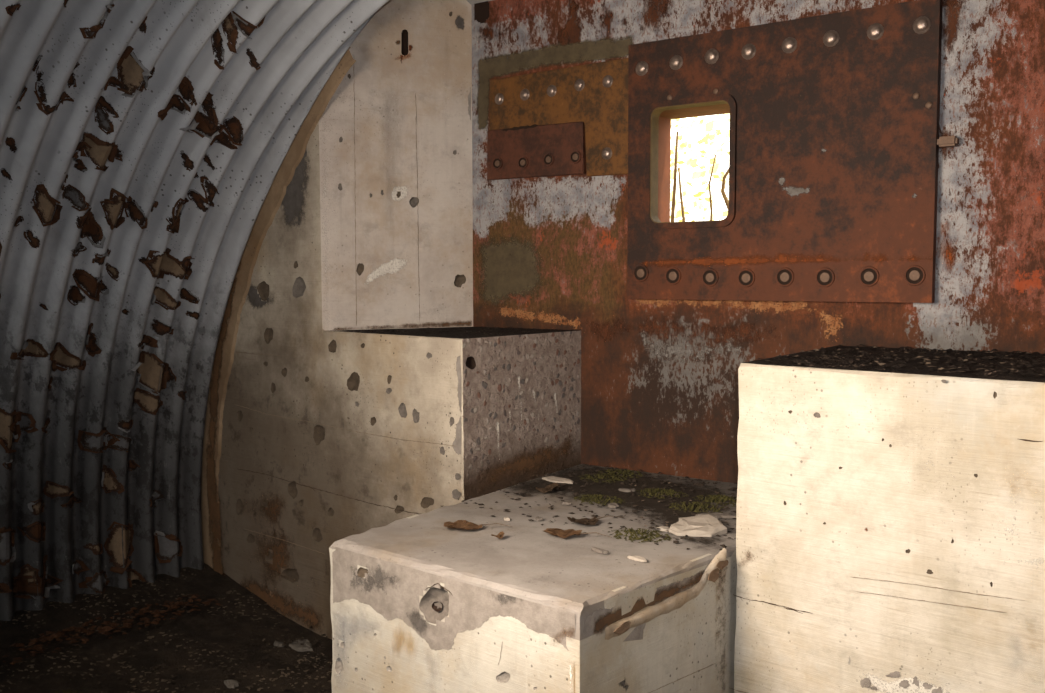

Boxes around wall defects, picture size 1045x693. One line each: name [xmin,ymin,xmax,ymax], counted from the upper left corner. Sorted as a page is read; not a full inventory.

corrosion [476,25,502,42]
corrosion [557,0,582,46]
corrosion [600,6,627,39]
corrosion [640,0,673,31]
corrosion [942,0,963,53]
peeling [116,46,155,98]
peeling [80,102,118,171]
peeling [32,175,130,230]
peeling [143,248,192,310]
peeling [669,514,727,537]
peeling [312,528,729,651]
crack [735,595,813,614]